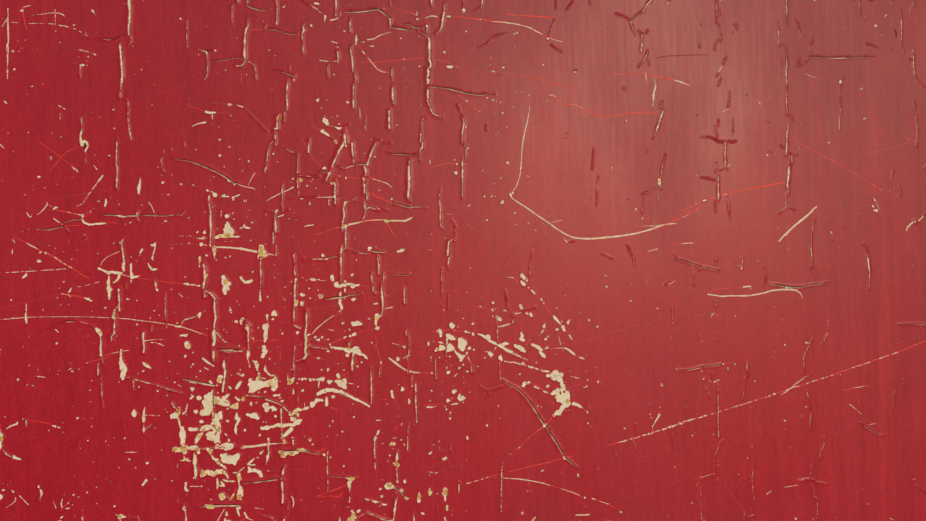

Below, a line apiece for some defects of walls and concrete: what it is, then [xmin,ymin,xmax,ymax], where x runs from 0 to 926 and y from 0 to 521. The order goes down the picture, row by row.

crack [614,0,672,92]
crack [640,100,668,215]
crack [673,0,926,297]
peeling [197,212,251,268]
crack [25,0,499,521]
peeling [175,274,254,370]
peeling [115,309,374,521]
peeling [426,321,474,375]
peeling [485,303,549,364]
crack [468,360,581,513]
peeling [522,368,588,424]
crack [677,361,750,464]